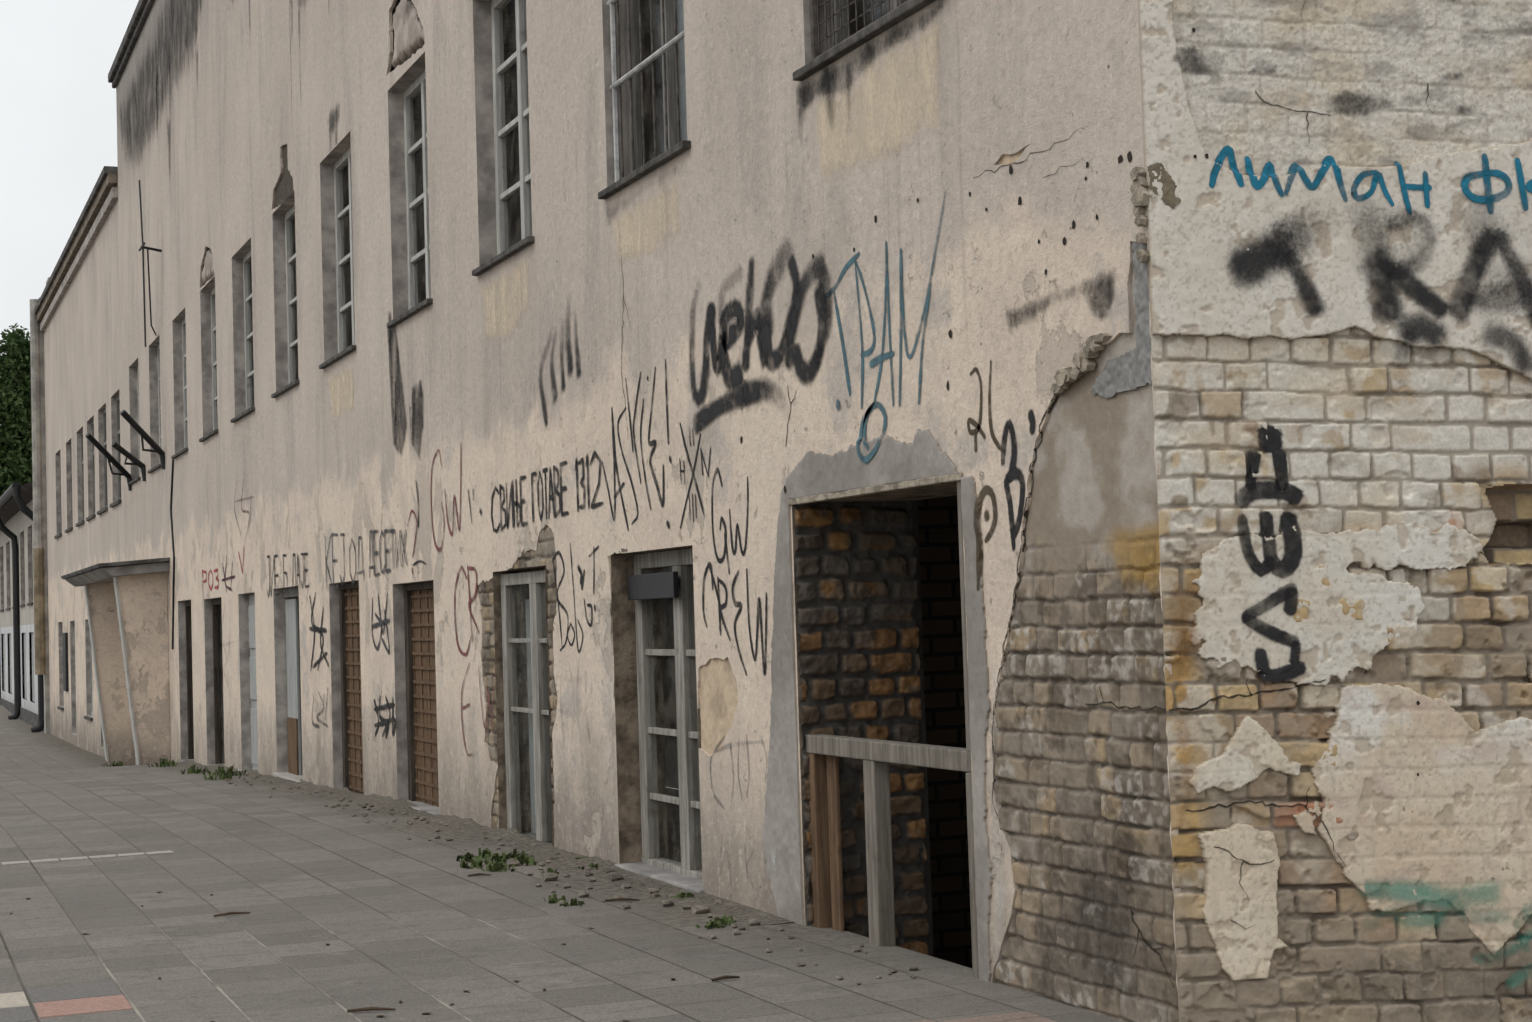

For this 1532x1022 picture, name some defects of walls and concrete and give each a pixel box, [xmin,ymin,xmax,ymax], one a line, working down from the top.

damp [120,0,201,173]
damp [797,6,939,119]
crack [973,128,1094,178]
flaking render [477,579,499,828]
flaking render [510,526,558,831]
flaking render [994,150,1181,1022]
flaking render [1189,483,1532,956]
flaking render [1197,823,1288,981]